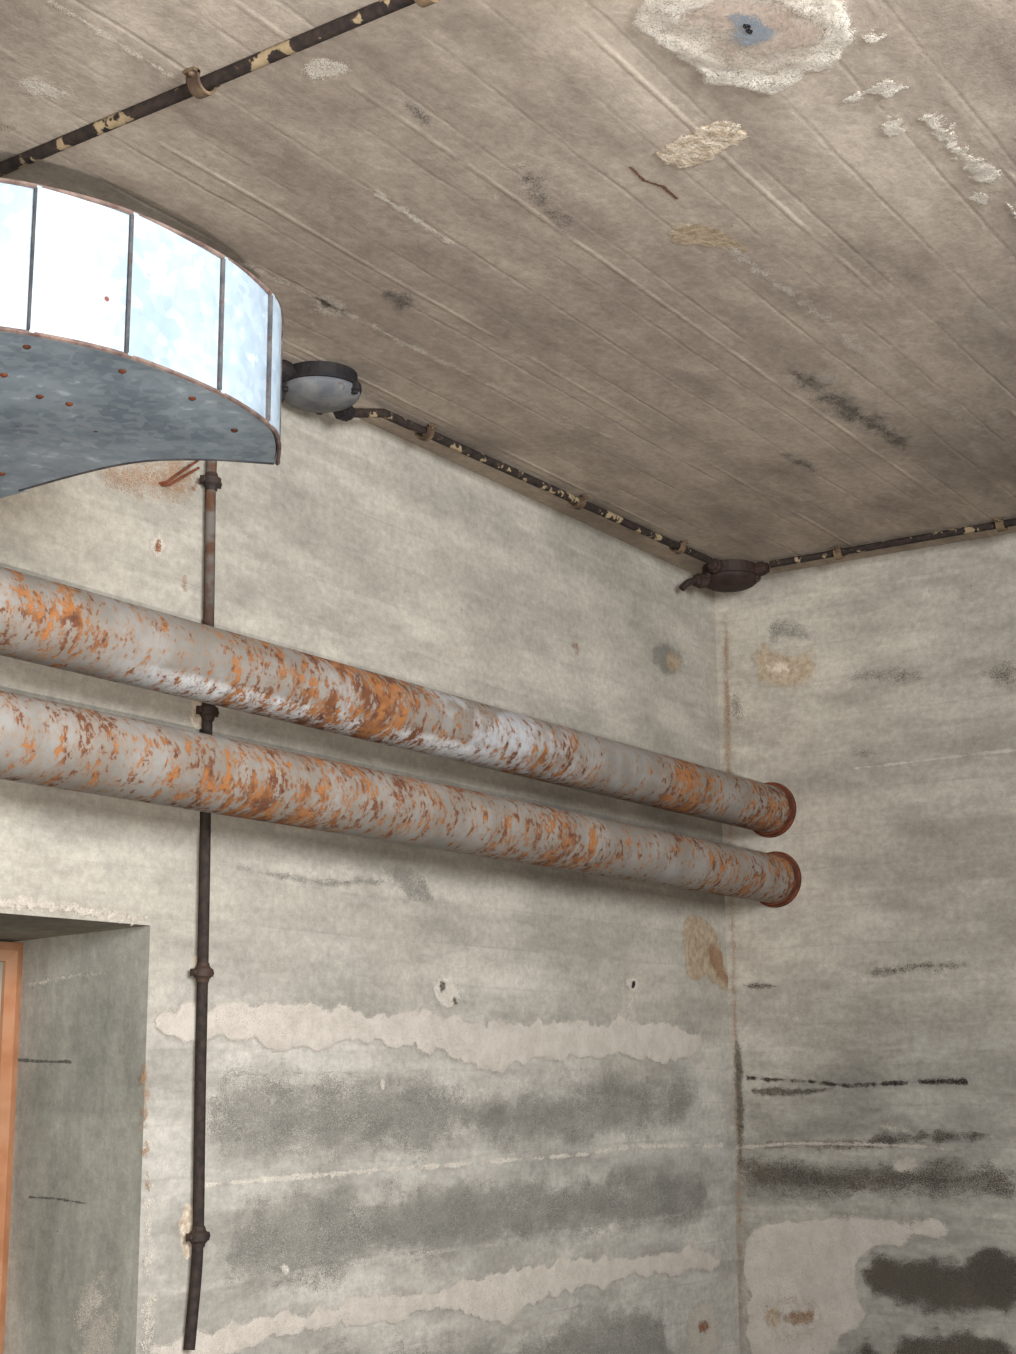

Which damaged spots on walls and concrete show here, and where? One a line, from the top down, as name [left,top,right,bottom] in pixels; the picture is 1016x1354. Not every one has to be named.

spalling [655,121,748,169]
water stain [433,974,461,1009]
water stain [205,1058,722,1298]
water stain [738,1154,1016,1206]
water stain [389,1300,719,1354]
water stain [763,1295,823,1347]
water stain [842,1245,1016,1354]